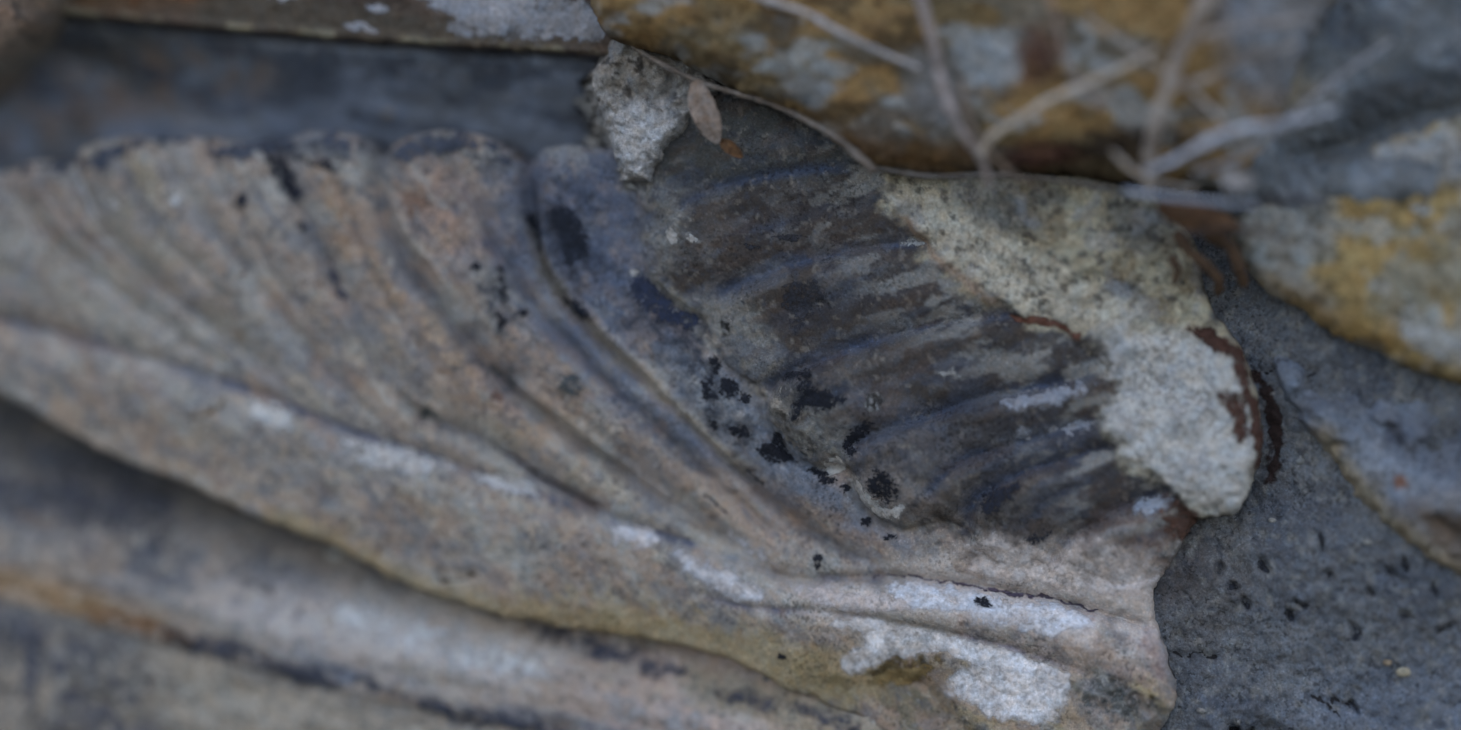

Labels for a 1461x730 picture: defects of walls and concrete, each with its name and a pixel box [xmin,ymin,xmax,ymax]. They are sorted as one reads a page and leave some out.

rust [1188,326,1284,484]